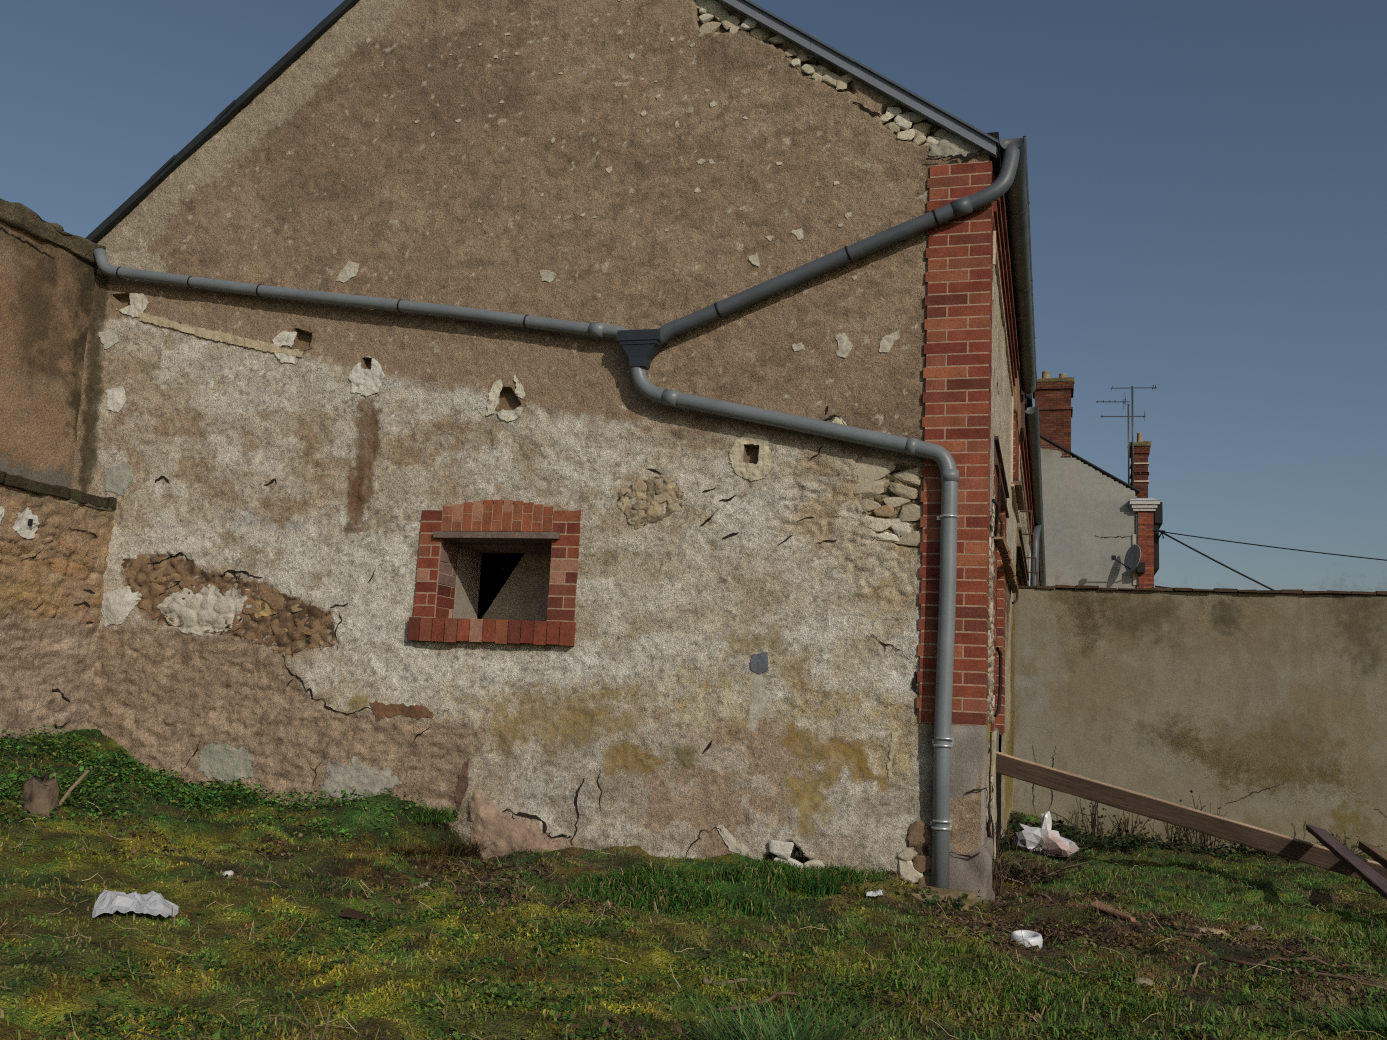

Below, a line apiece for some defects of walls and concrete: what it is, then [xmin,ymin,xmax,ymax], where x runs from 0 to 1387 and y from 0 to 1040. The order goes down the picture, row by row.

spalling [690,0,854,93]
spalling [880,105,949,145]
spalling [272,325,316,364]
leakage [0,275,108,493]
spalling [348,356,385,397]
spalling [486,375,527,422]
spalling [617,475,685,529]
spalling [853,456,924,547]
spalling [101,554,338,655]
crack [282,655,373,715]
leakage [783,727,884,781]
crack [503,769,603,845]